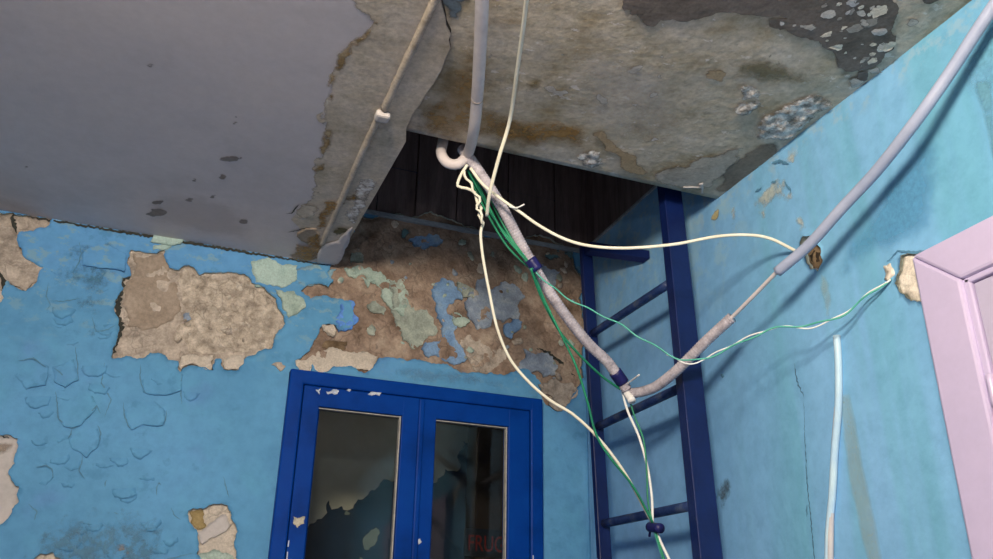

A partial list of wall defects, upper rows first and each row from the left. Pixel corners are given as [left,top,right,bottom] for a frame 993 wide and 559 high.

spalling [272,0,584,412]
spalling [0,213,63,302]
spalling [81,251,285,395]
spalling [0,435,19,525]
spalling [188,504,237,559]